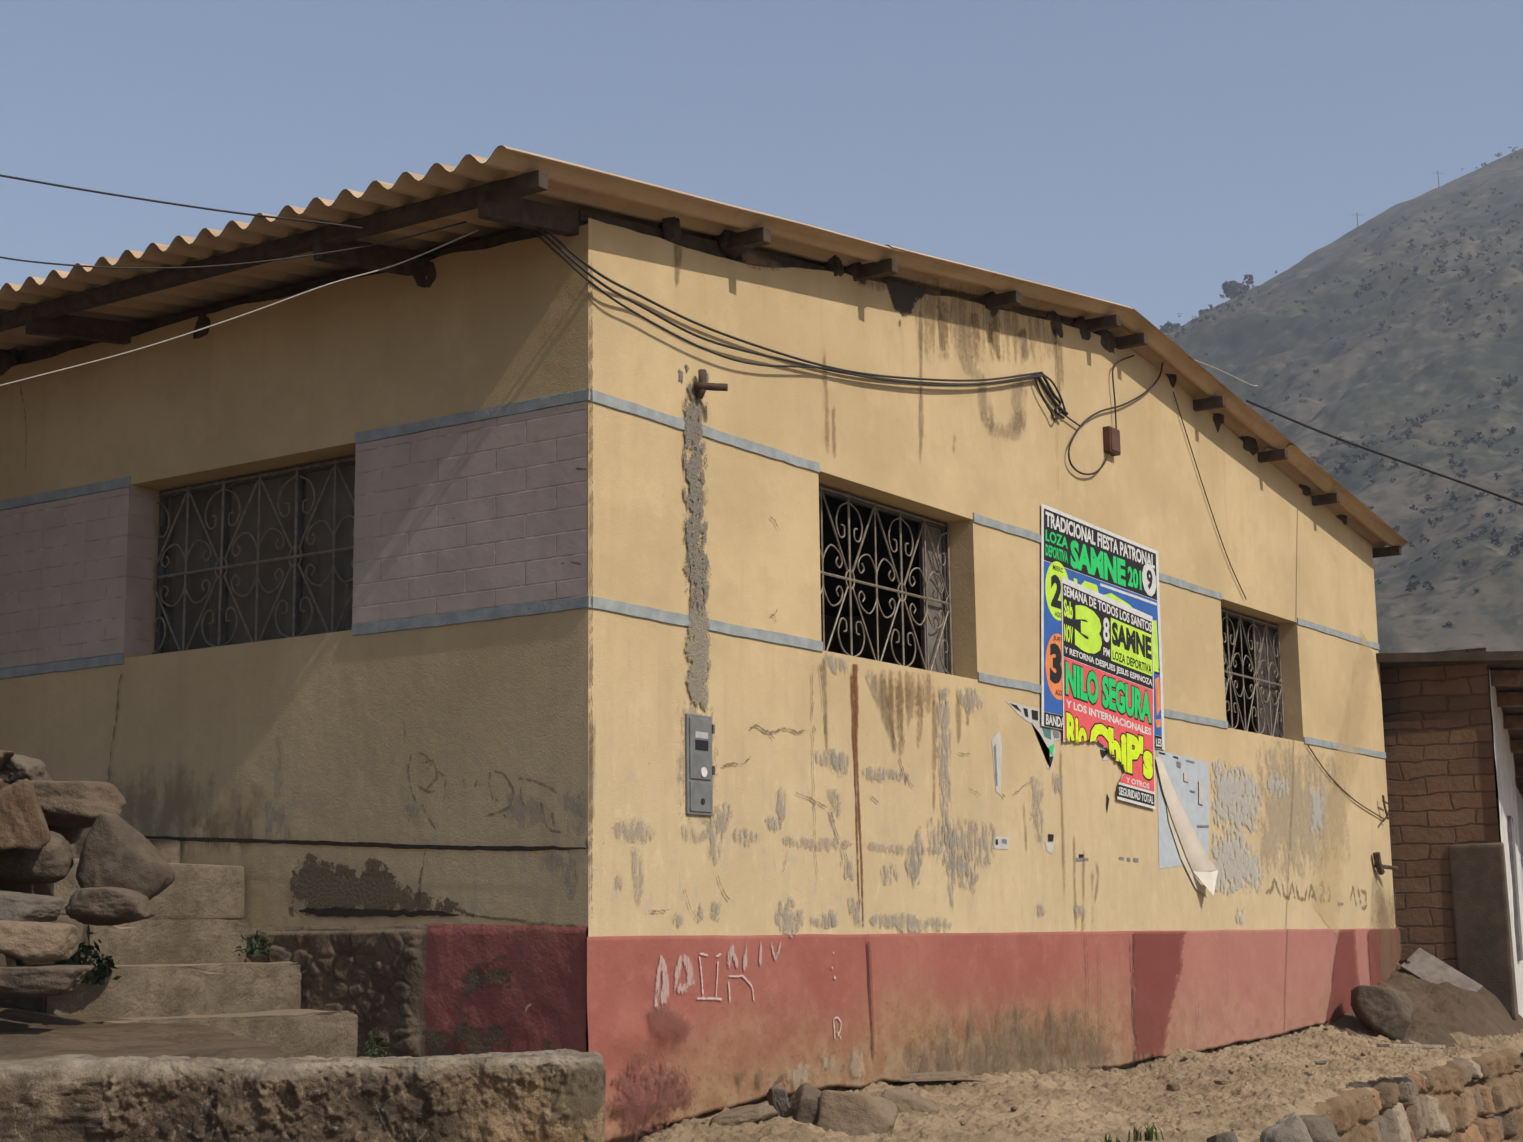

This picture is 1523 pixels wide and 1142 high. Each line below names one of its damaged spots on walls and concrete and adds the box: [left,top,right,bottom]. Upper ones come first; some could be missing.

peeling [707,787,787,864]
peeling [775,687,996,938]
peeling [1030,773,1062,841]
peeling [1211,760,1290,924]
flaking render [244,853,512,1087]